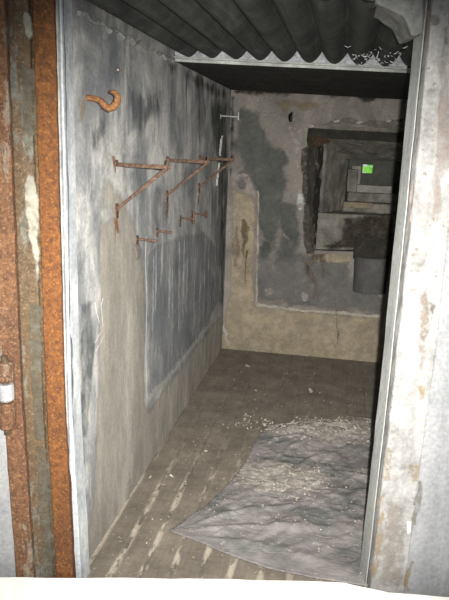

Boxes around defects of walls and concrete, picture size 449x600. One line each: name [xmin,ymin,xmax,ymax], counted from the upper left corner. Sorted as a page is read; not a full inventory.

water stain [132,95,159,127]
water stain [149,103,226,388]
water stain [235,109,381,313]
water stain [81,303,94,416]